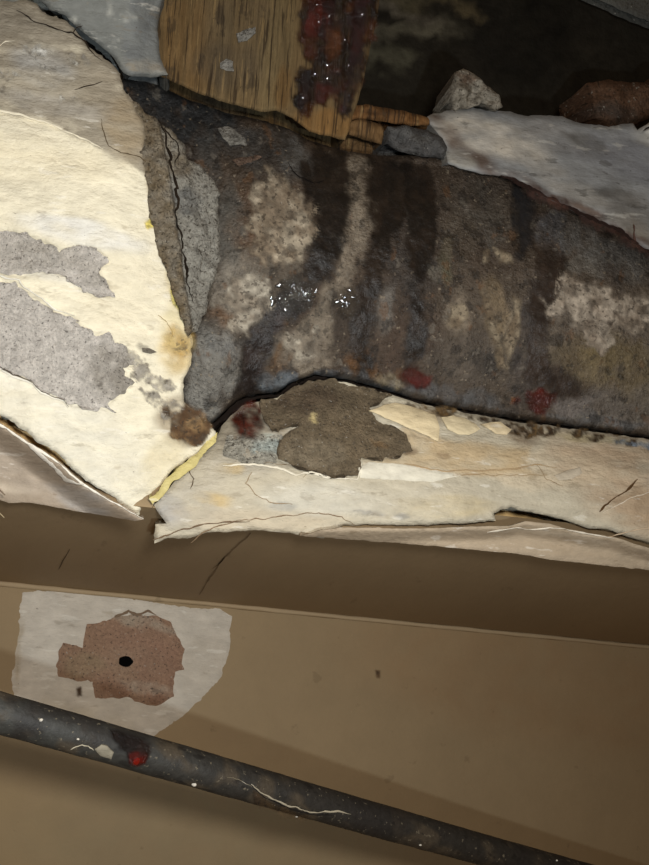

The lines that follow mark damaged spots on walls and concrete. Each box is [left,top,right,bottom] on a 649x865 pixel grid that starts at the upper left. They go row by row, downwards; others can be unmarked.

rust [293,0,378,117]
spalling [0,231,156,413]
crack [101,117,203,303]
damp [218,273,315,394]
damp [246,148,351,281]
damp [350,154,437,369]
damp [481,187,649,395]
crack [0,416,70,468]
spalling [222,378,555,482]
crack [212,376,649,440]
crack [153,462,356,595]
spalling [56,610,185,706]